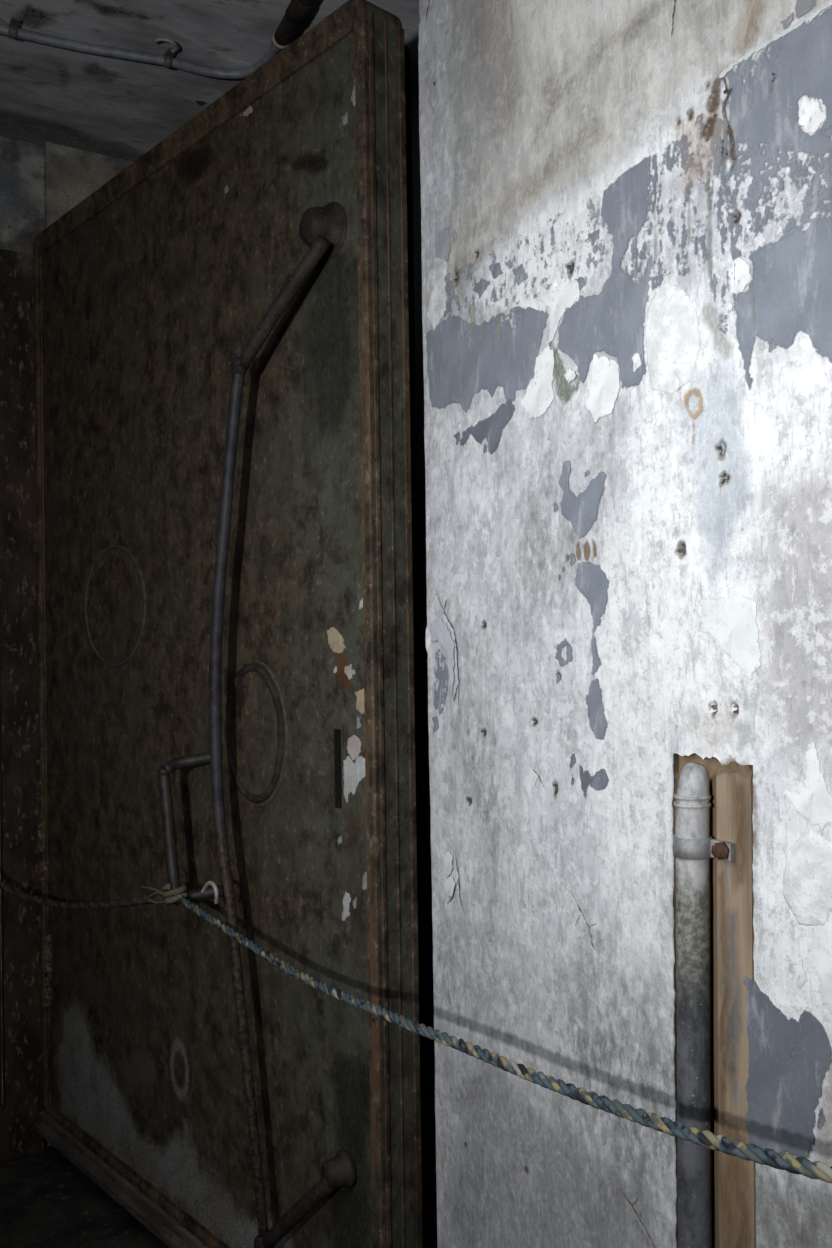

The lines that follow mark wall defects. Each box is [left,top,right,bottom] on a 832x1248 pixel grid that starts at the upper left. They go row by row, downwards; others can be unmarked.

peeling [426,0,832,454]
rust [684,389,703,443]
peeling [554,460,606,538]
peeling [554,639,573,683]
peeling [568,553,609,739]
flaking render [783,741,832,829]
peeling [743,977,832,1158]